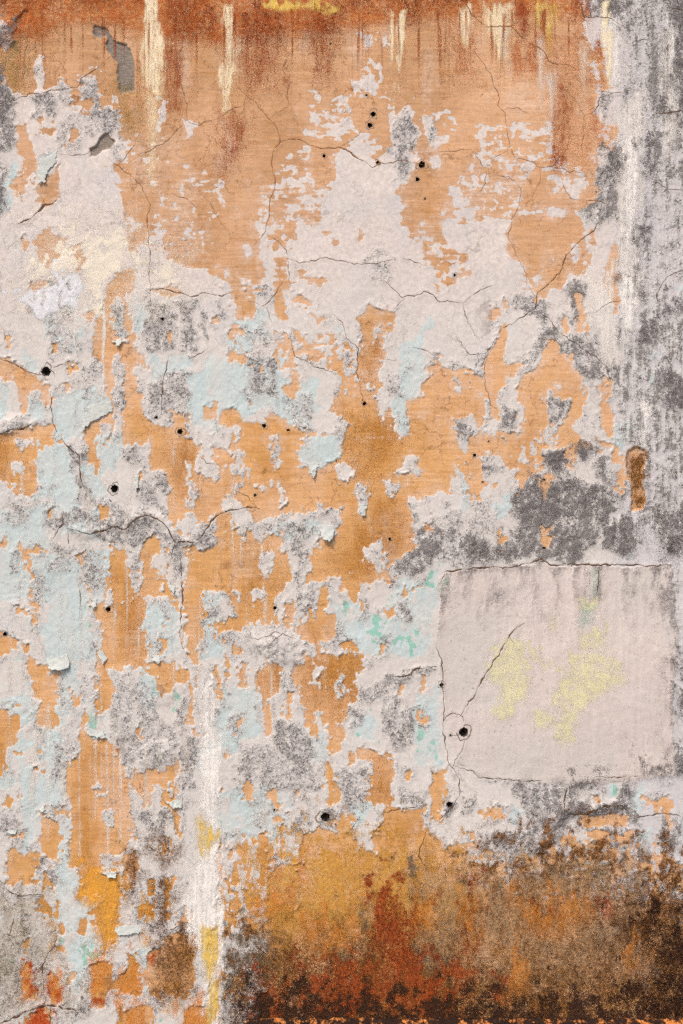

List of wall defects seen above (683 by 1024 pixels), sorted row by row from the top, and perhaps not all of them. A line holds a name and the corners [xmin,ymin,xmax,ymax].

peeling [10,26,267,368]
corrosion [0,0,614,181]
crack [115,0,630,411]
peeling [311,94,455,266]
leakage [575,0,683,369]
leakage [326,337,421,583]
leakage [463,364,683,570]
peeling [0,268,647,1024]
leakage [0,435,683,1024]
corrosion [226,802,617,1019]
crack [349,623,541,868]
crack [564,789,677,819]